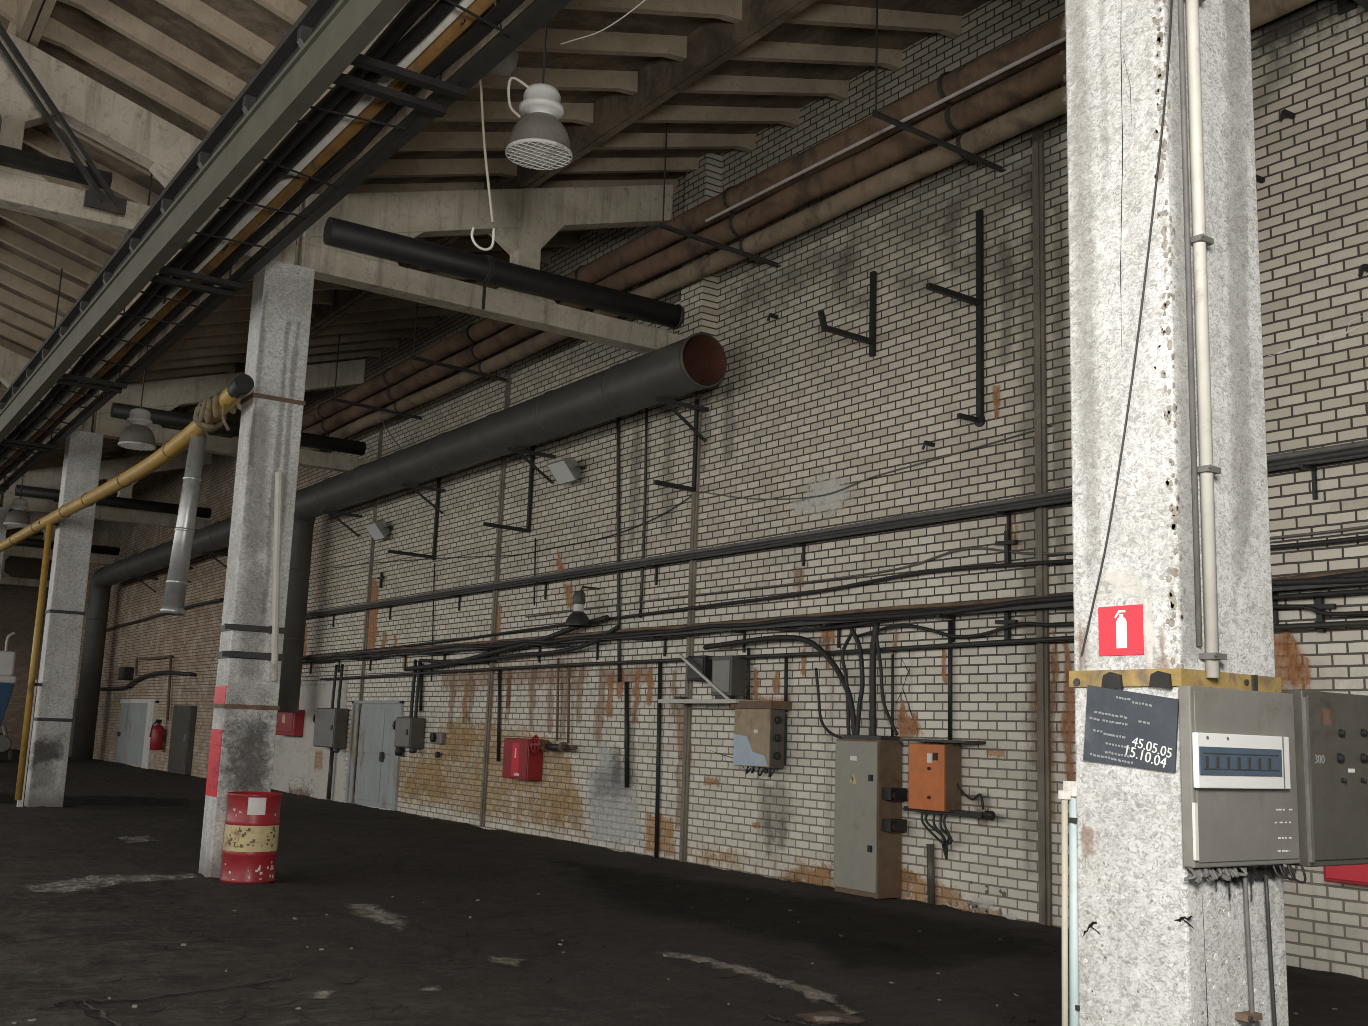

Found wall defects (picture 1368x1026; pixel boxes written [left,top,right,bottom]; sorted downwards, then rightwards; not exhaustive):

corrosion [364,580,407,669]
corrosion [606,670,654,723]
corrosion [750,669,789,712]
peeling [398,717,582,829]
crack [39,975,307,1026]